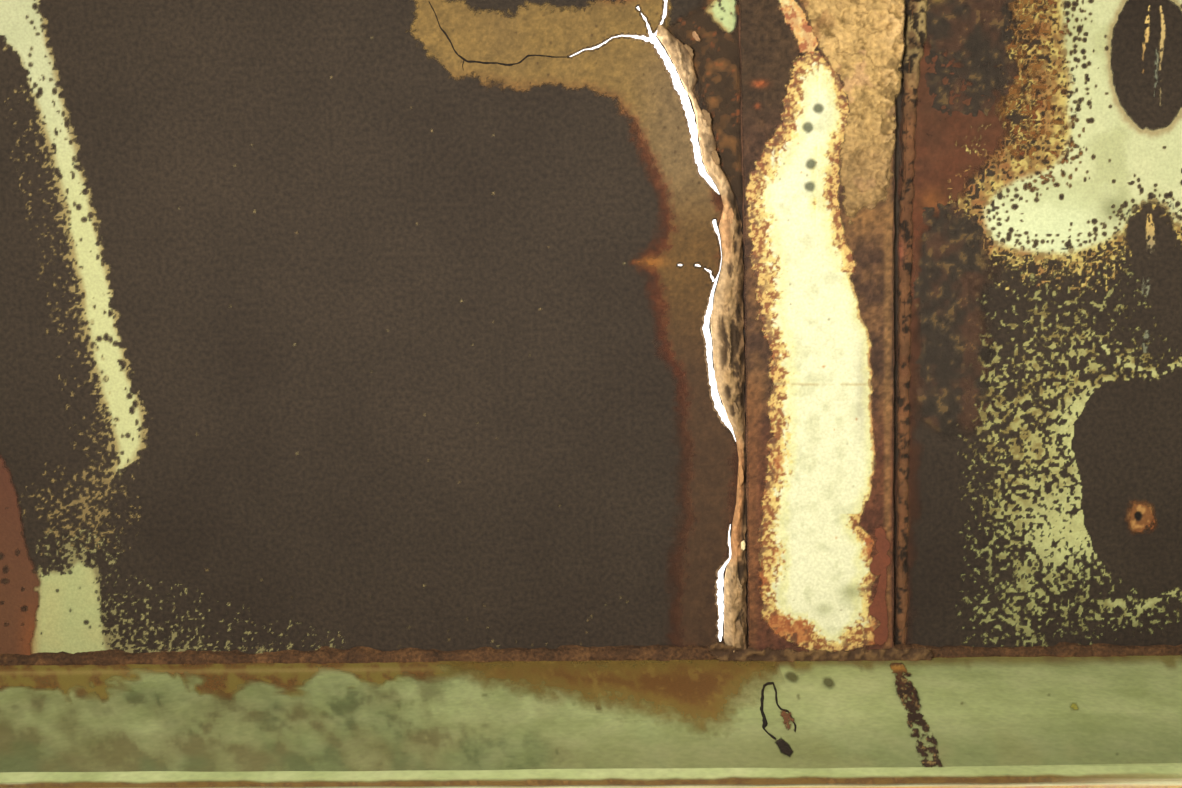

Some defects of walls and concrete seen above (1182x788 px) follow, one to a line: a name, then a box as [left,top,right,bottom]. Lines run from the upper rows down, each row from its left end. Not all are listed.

peeling [706,0,735,33]
leakage [1154,6,1165,105]
crack [429,0,736,442]
corrosion [0,0,850,729]
corrosion [837,0,1083,666]
peeling [947,0,1182,647]
corrosion [1128,502,1156,533]
crack [714,524,730,640]
corrosion [0,663,1182,788]